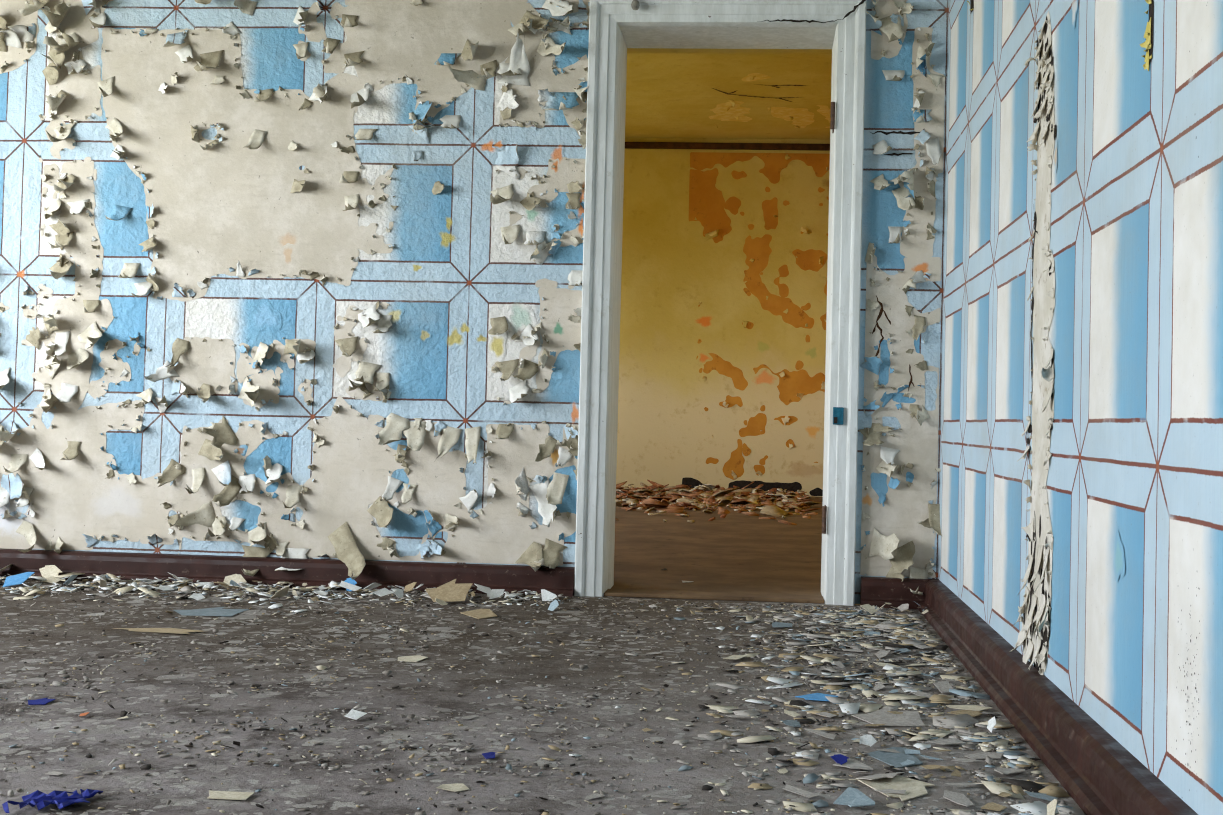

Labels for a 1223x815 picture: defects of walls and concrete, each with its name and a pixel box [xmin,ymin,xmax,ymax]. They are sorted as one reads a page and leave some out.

peeling [0,0,590,580]
peeling [689,152,830,343]
peeling [696,339,825,480]
peeling [859,0,947,595]
peeling [1010,11,1056,675]